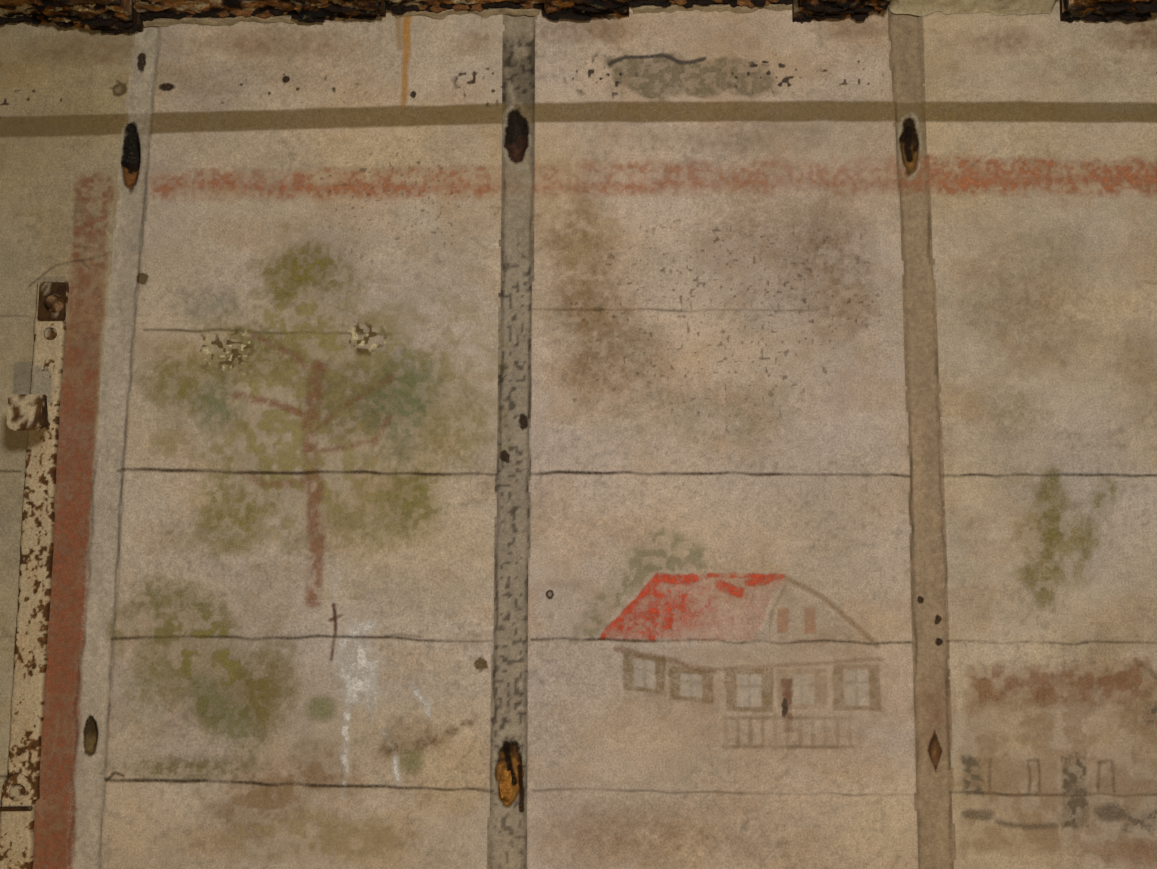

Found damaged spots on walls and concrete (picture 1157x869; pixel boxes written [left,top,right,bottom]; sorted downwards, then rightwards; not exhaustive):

corrosion [492,724,525,812]